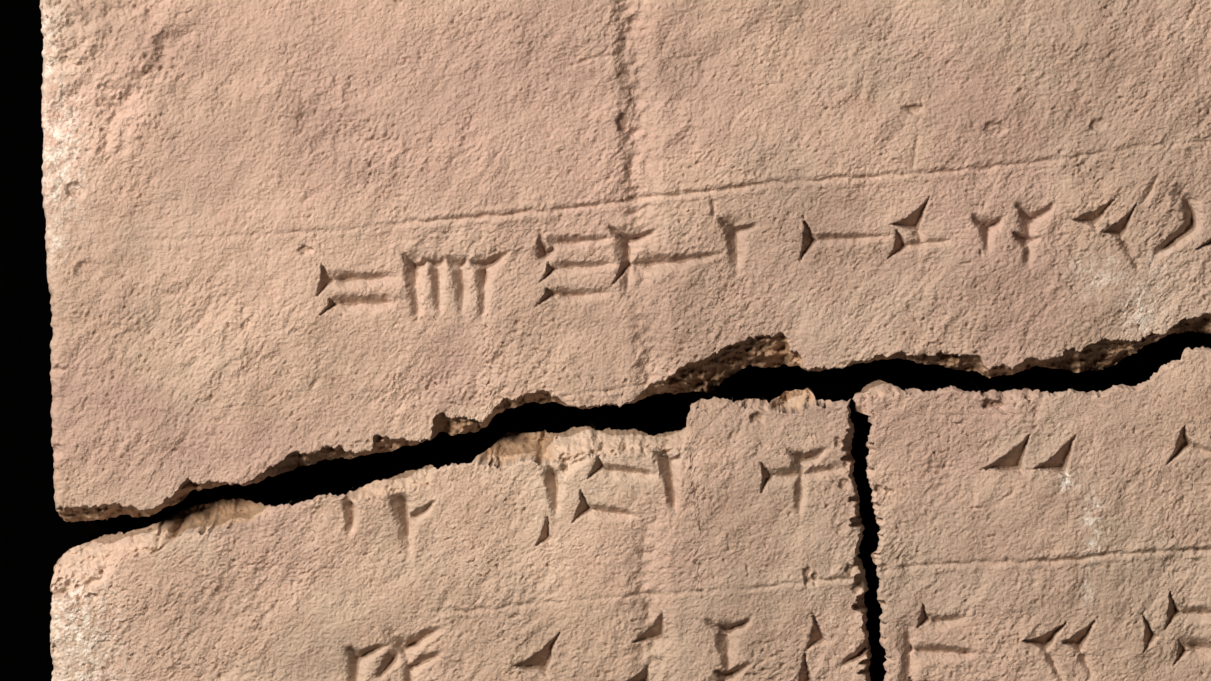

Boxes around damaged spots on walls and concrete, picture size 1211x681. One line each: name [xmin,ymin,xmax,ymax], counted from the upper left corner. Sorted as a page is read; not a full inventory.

crack [82,331,1211,681]